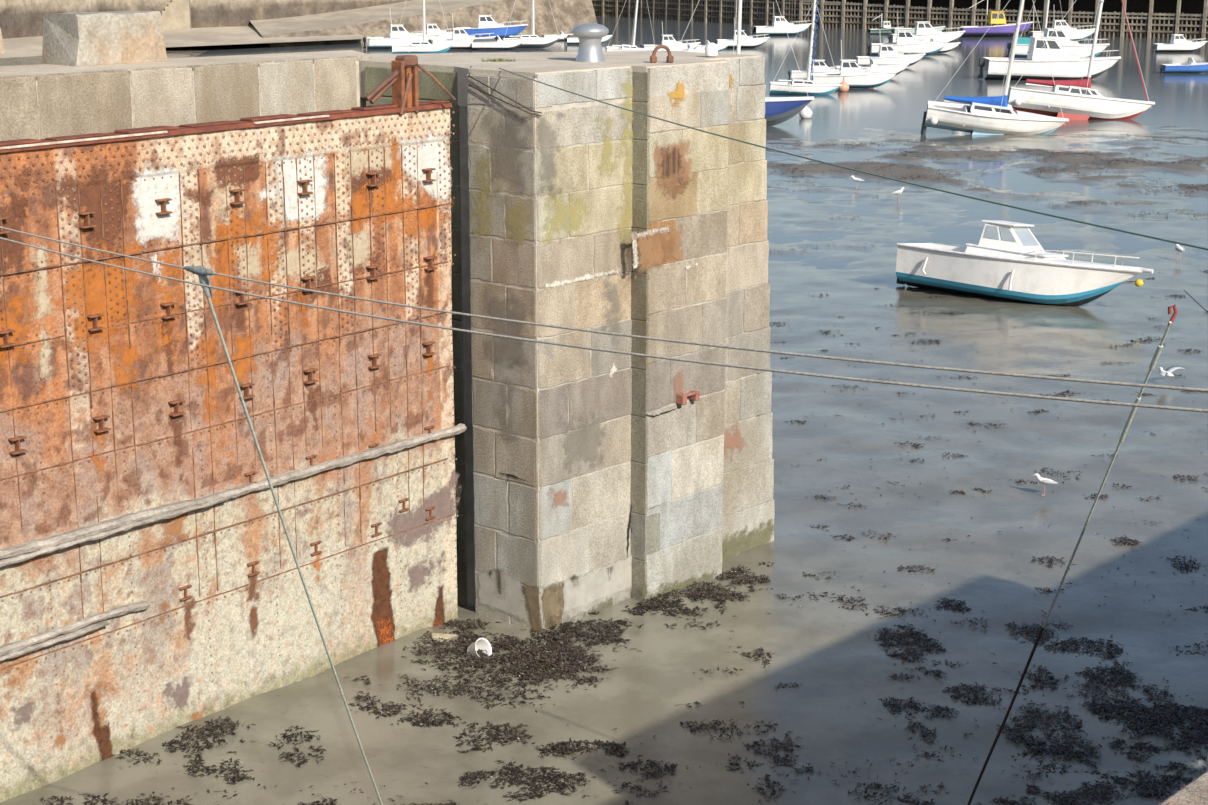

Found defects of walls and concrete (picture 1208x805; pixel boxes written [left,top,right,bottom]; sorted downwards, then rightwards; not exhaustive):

rust [0,177,40,274]
rust [57,164,141,391]
rust [152,253,183,373]
rust [189,153,260,207]
rust [196,304,256,419]
rust [211,202,282,308]
rust [346,137,451,243]
rust [654,140,692,198]
rust [169,412,183,467]
rust [162,512,189,545]
rust [184,599,195,640]
rust [246,575,259,636]